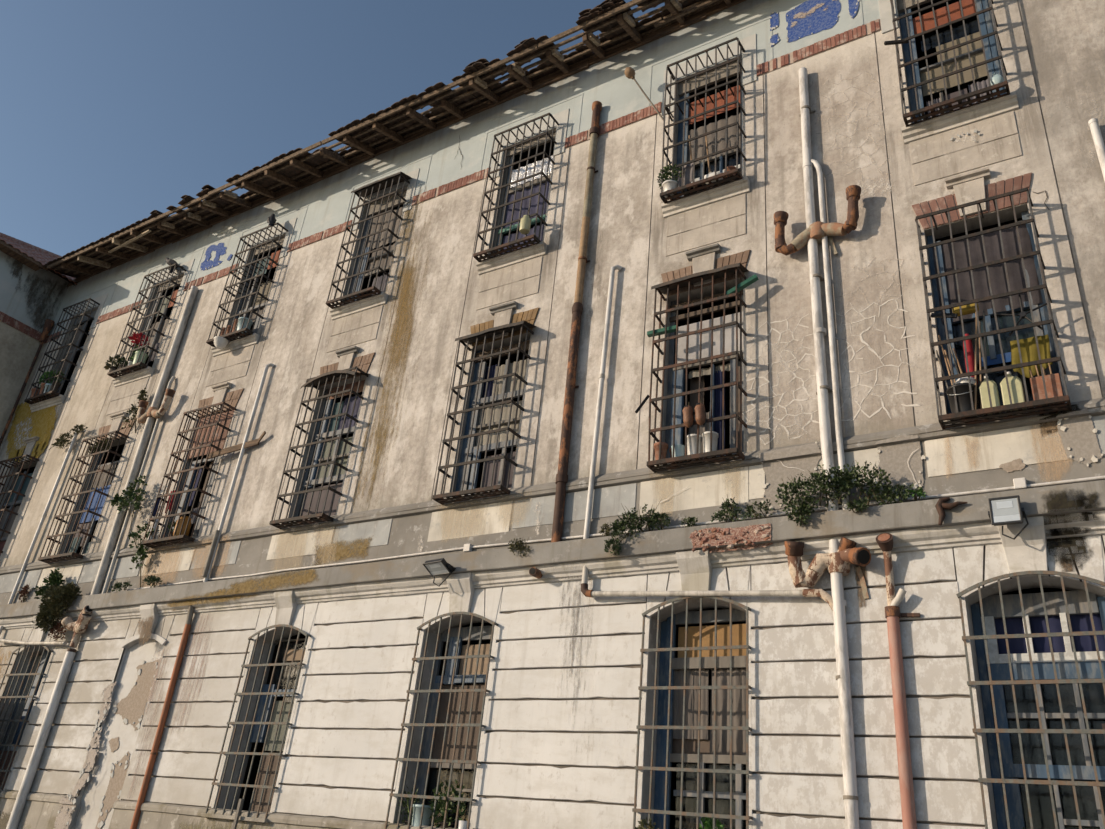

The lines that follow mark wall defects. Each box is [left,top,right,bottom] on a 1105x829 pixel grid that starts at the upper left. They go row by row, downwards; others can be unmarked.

peeling [769,0,860,47]
leakage [11,260,67,329]
leakage [354,198,418,500]
crack [742,258,920,471]
peeling [1056,408,1103,467]
flaking render [689,523,773,553]
leakage [1044,490,1100,572]
peeling [53,659,160,829]